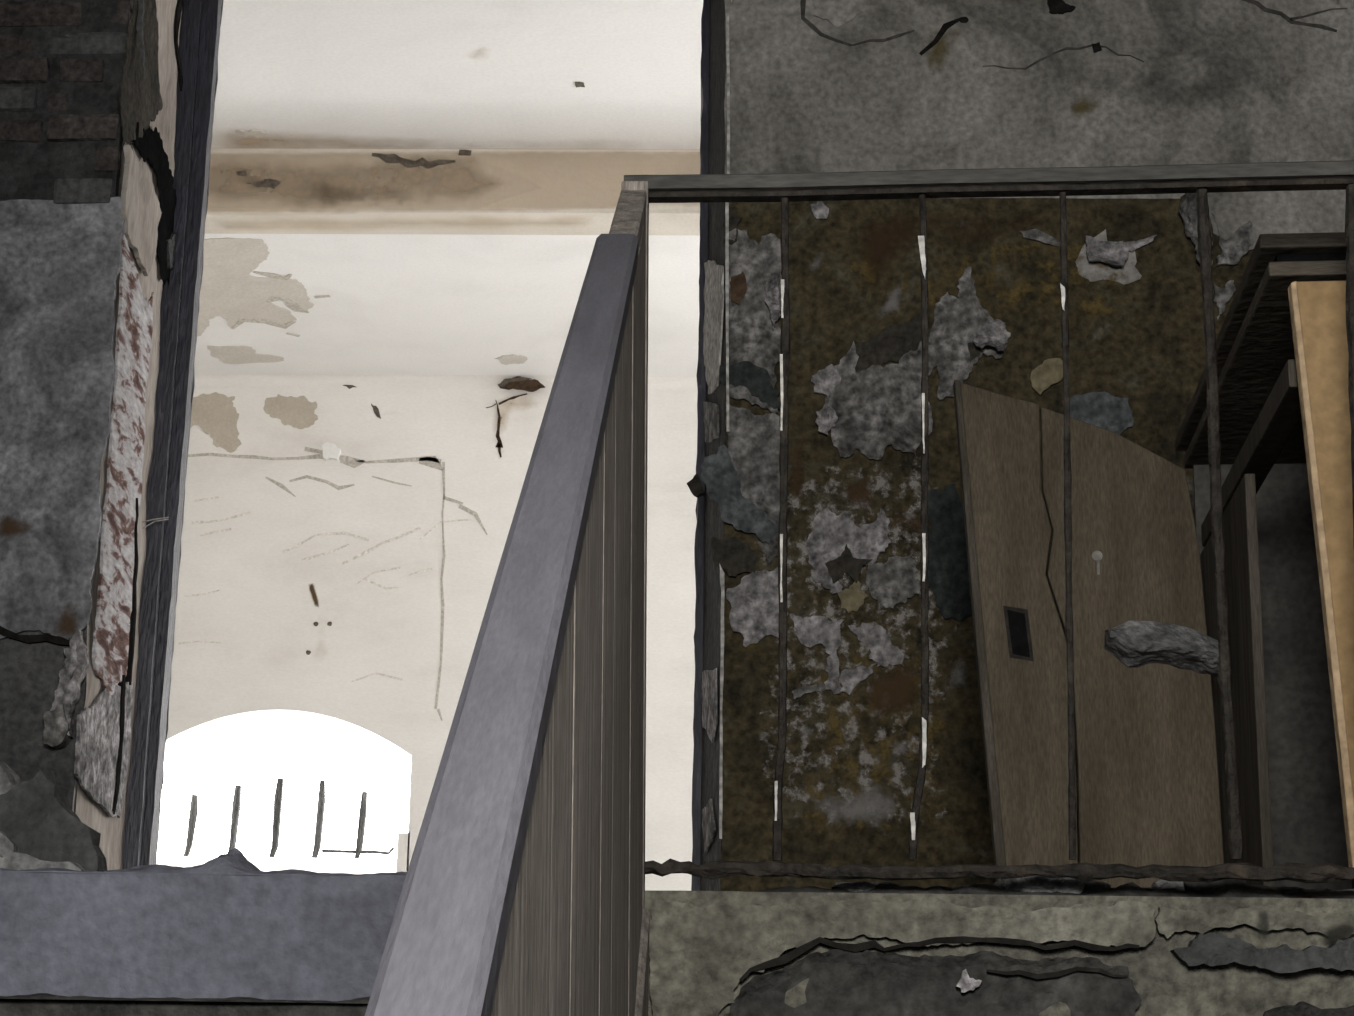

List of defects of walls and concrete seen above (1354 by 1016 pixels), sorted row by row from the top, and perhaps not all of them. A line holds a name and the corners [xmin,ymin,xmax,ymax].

crack [800,0,963,56]
crack [1243,0,1347,32]
damp [215,166,493,202]
peeling [197,238,331,364]
spalling [0,0,177,818]
peeling [190,392,241,453]
peeling [263,394,318,429]
flaking render [687,201,1156,854]
crack [185,447,488,721]
crack [0,626,70,646]
flaking render [649,897,1354,1016]